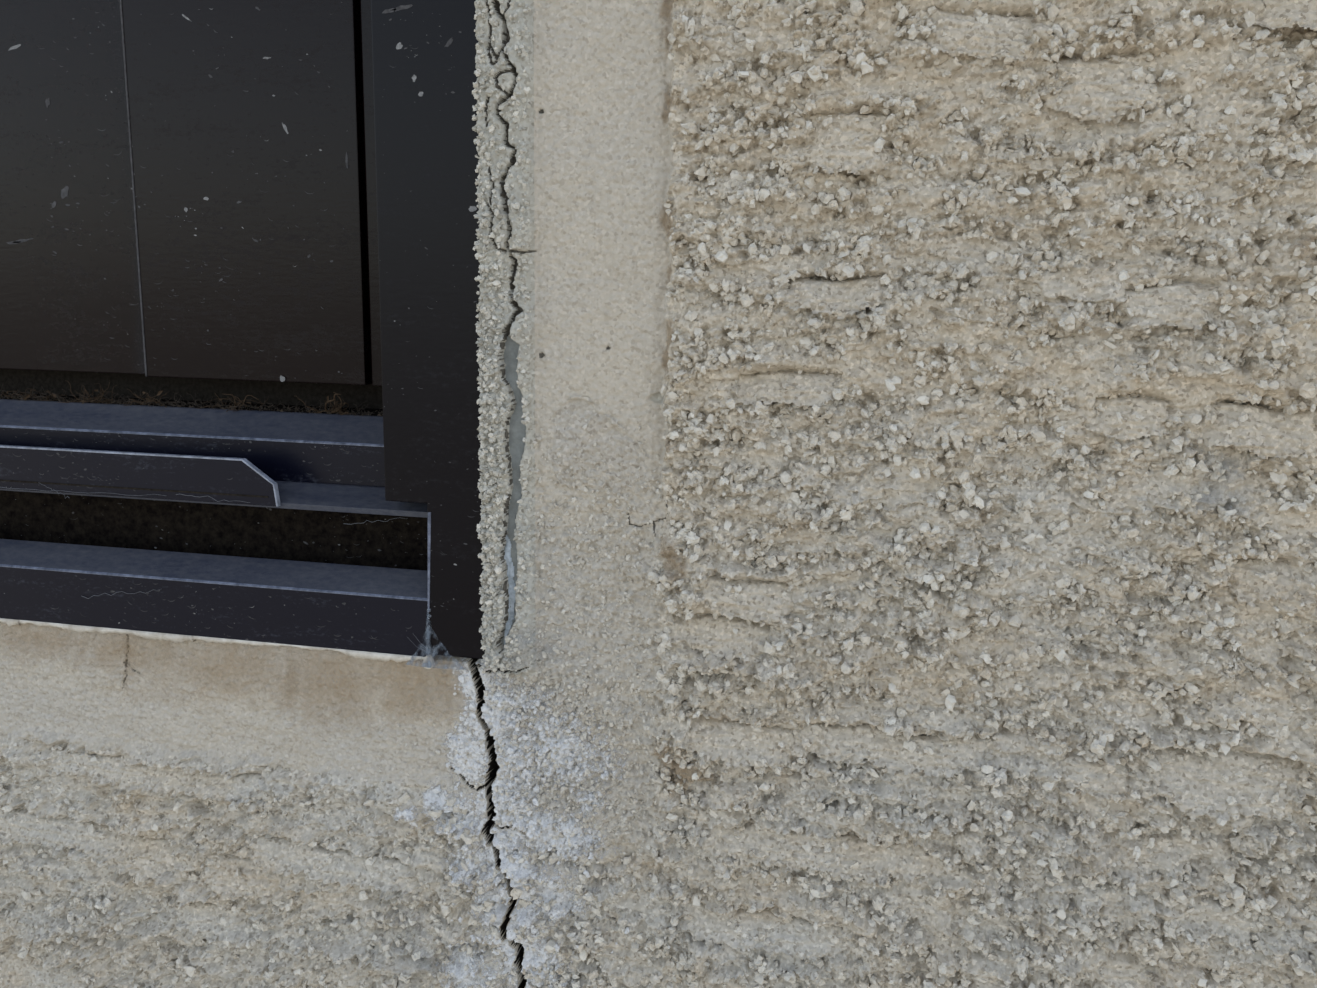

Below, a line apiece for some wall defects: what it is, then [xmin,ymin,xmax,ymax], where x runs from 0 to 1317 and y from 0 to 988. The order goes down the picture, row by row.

crack [450,0,536,988]